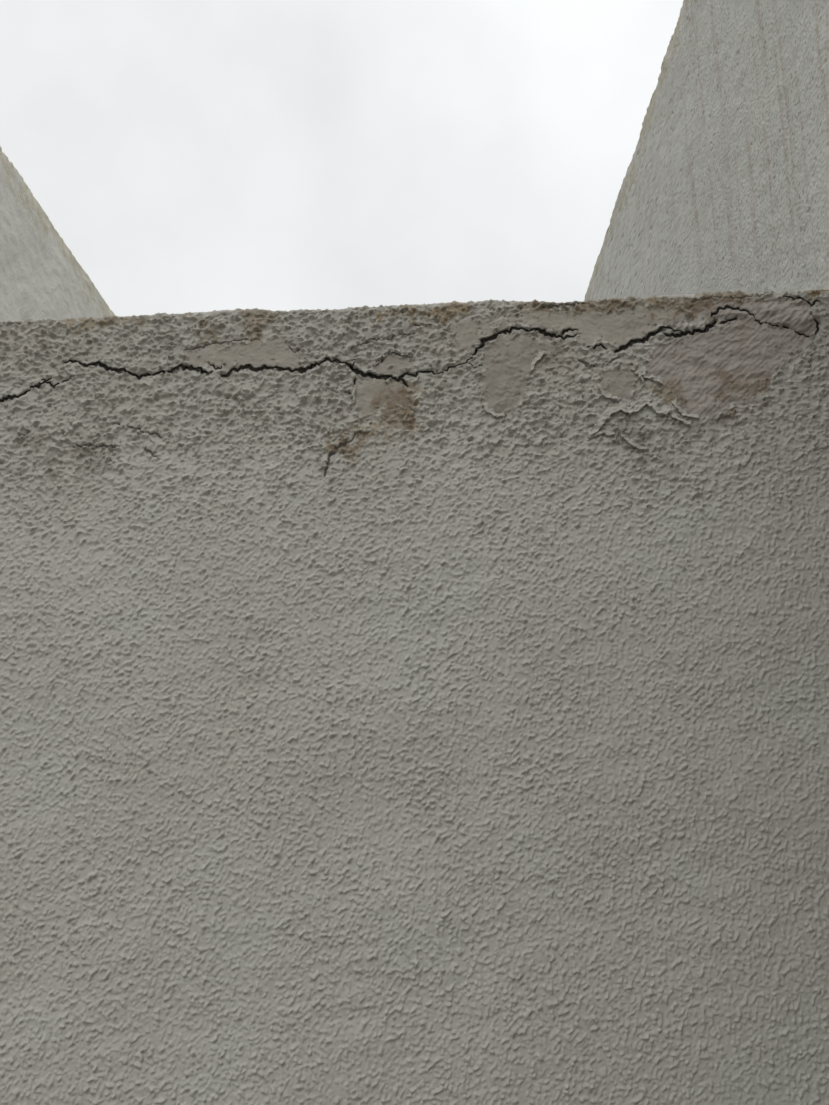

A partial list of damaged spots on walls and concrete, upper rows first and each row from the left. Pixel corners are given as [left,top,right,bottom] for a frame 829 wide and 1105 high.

peeling [348,347,416,418]
crack [0,291,820,402]
peeling [448,296,817,450]